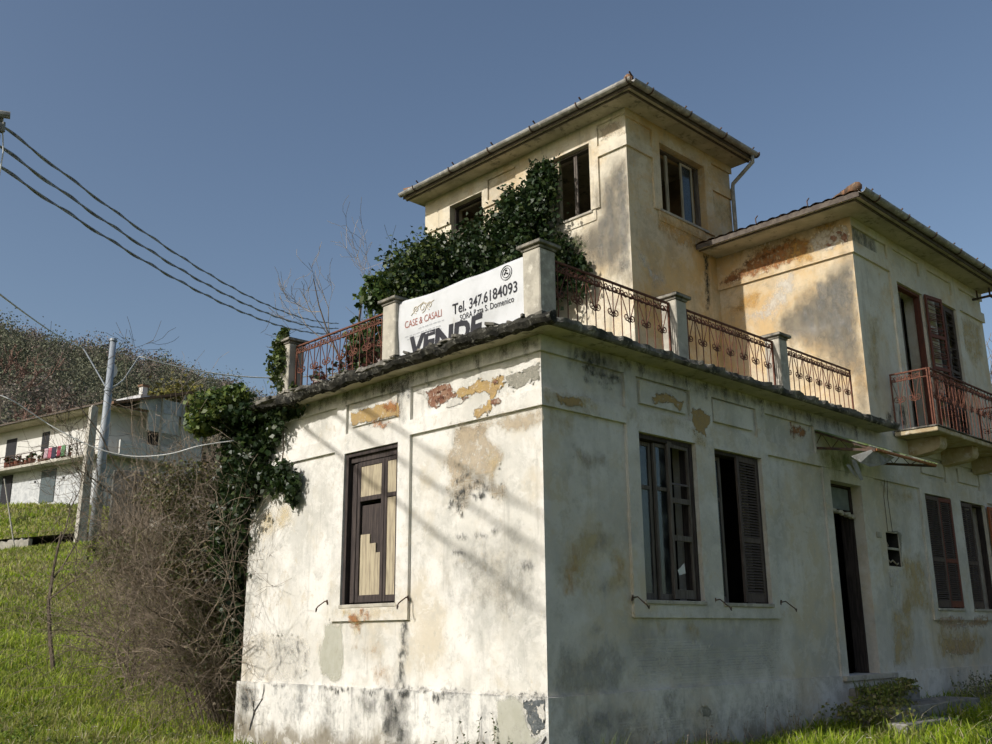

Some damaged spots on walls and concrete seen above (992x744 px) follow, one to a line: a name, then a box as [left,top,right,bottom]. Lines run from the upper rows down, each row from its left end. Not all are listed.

damp [563,162,628,272]
flaking render [724,224,850,283]
damp [782,265,861,375]
flaking render [350,400,400,428]
flaking render [416,362,541,514]
peeling [556,393,583,407]
flaking render [652,391,710,438]
damp [362,621,458,739]
flaking render [522,697,546,736]